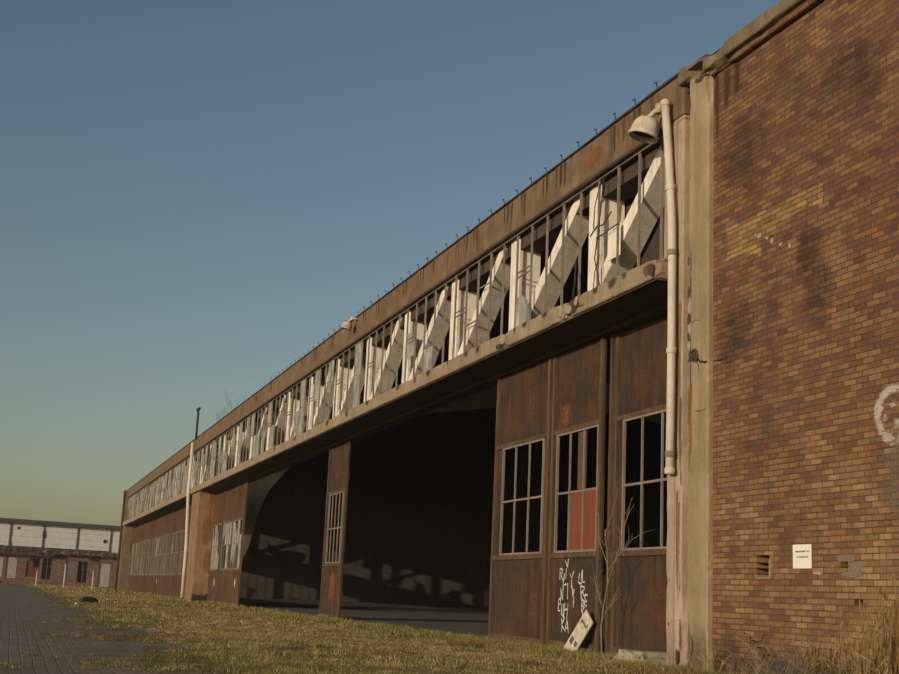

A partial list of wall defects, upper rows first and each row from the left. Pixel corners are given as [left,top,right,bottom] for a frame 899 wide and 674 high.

leakage [715,62,739,131]
spalling [813,554,864,578]